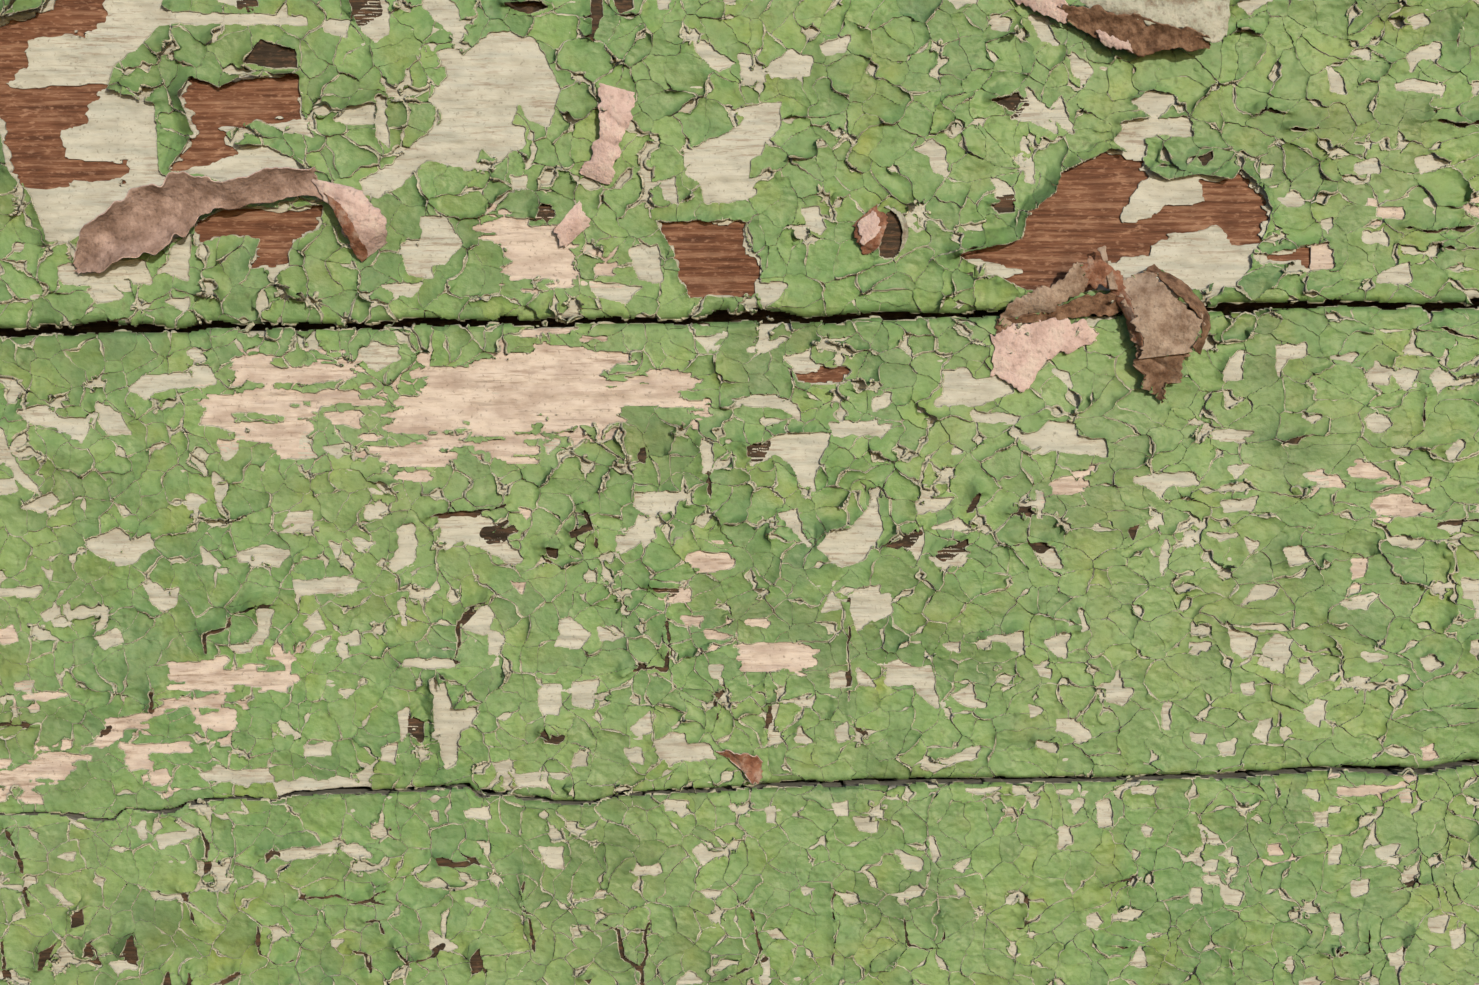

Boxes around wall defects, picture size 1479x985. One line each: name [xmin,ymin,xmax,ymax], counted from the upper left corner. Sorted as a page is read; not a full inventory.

peeling [0,0,395,313]
peeling [334,0,563,198]
peeling [381,29,851,307]
peeling [934,13,1412,310]
crack [1406,226,1476,250]
peeling [127,328,718,514]
crack [434,502,506,519]
peeling [0,497,550,809]
crack [453,599,492,664]
crack [181,828,212,924]
crack [298,890,446,973]
crack [600,920,652,985]